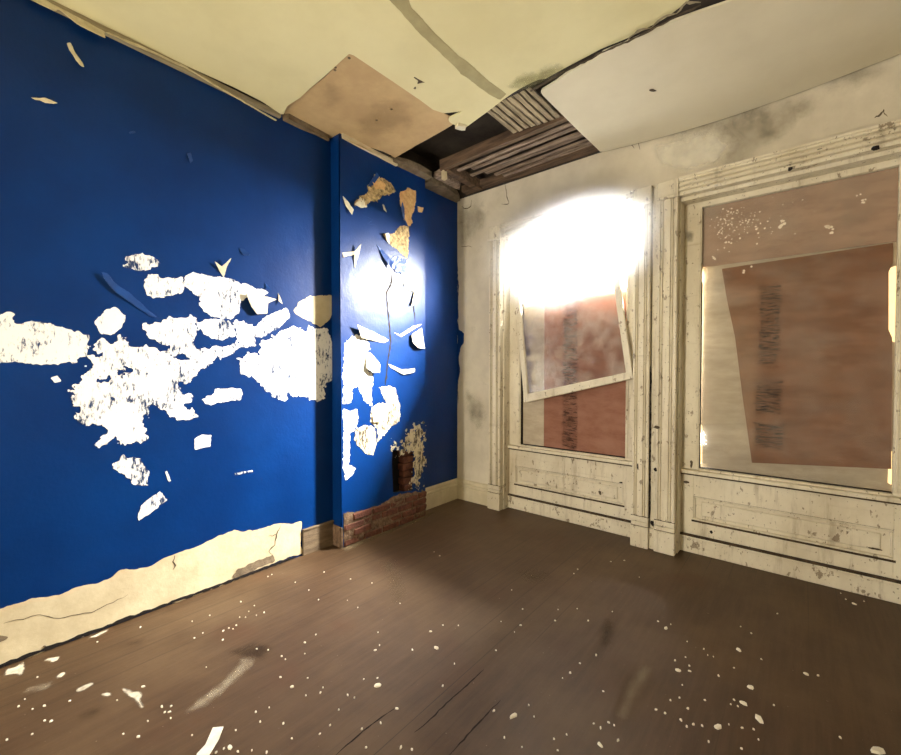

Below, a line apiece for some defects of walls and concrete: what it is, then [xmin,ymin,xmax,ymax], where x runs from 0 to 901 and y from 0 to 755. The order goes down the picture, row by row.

peeling [342,156,460,274]
crack [385,270,415,385]
peeling [0,253,427,548]
flaking render [0,521,303,664]